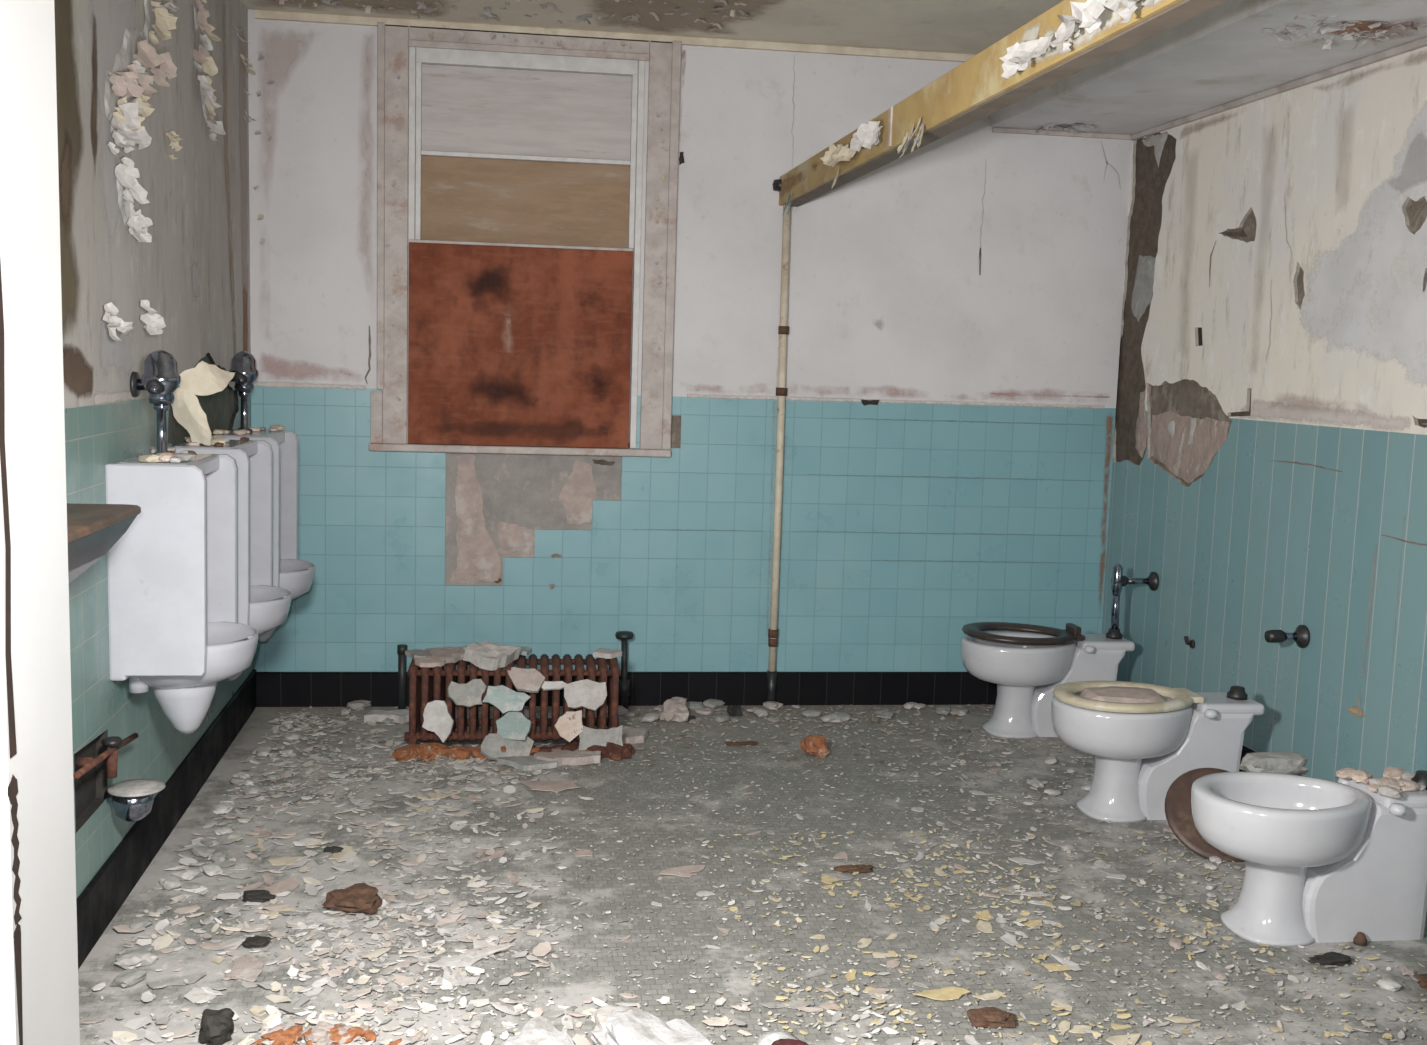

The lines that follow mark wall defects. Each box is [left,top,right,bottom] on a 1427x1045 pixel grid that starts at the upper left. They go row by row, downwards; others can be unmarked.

water stain [271,0,439,15]
water stain [597,0,775,33]
peeling [92,0,226,242]
peeling [101,300,166,372]
flaking render [1115,132,1232,486]
flaking render [1221,210,1257,242]
peeling [1297,106,1427,383]
peeling [445,453,622,586]